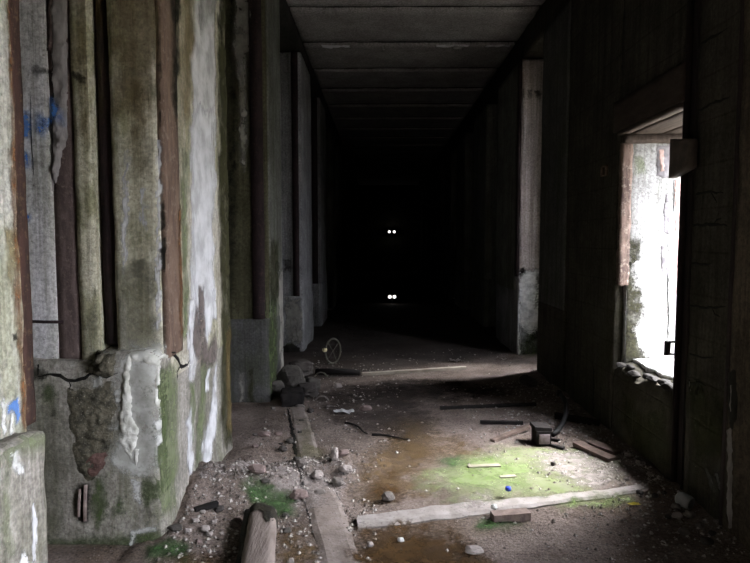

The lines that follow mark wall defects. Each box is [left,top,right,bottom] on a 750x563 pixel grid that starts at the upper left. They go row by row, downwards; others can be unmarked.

peeling [47,0,69,191]
corrosion [159,0,181,123]
corrosion [5,117,27,428]
corrosion [160,204,168,270]
damp [183,0,254,463]
crack [37,364,121,389]
spalling [67,344,120,523]
damp [111,343,194,514]
crack [171,352,190,378]